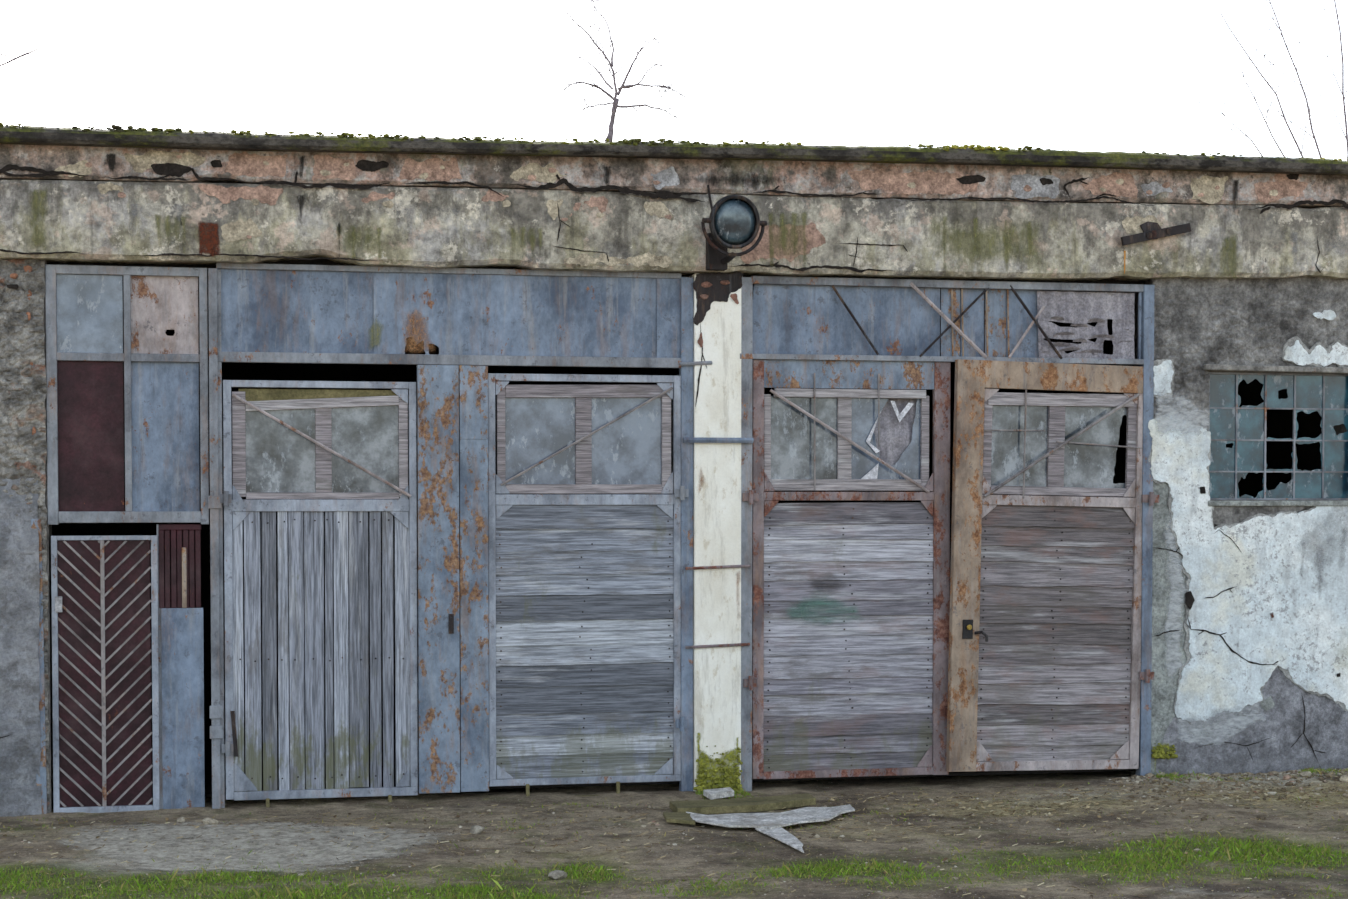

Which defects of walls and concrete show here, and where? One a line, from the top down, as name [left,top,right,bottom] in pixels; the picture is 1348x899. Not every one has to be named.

crack [0,164,706,262]
rust [405,311,431,351]
peeling [693,222,826,347]
spalling [1150,276,1348,431]
crack [1249,199,1348,273]
spalling [0,259,50,813]
crack [1155,586,1279,666]
spalling [1151,482,1348,775]
crack [1196,693,1326,768]